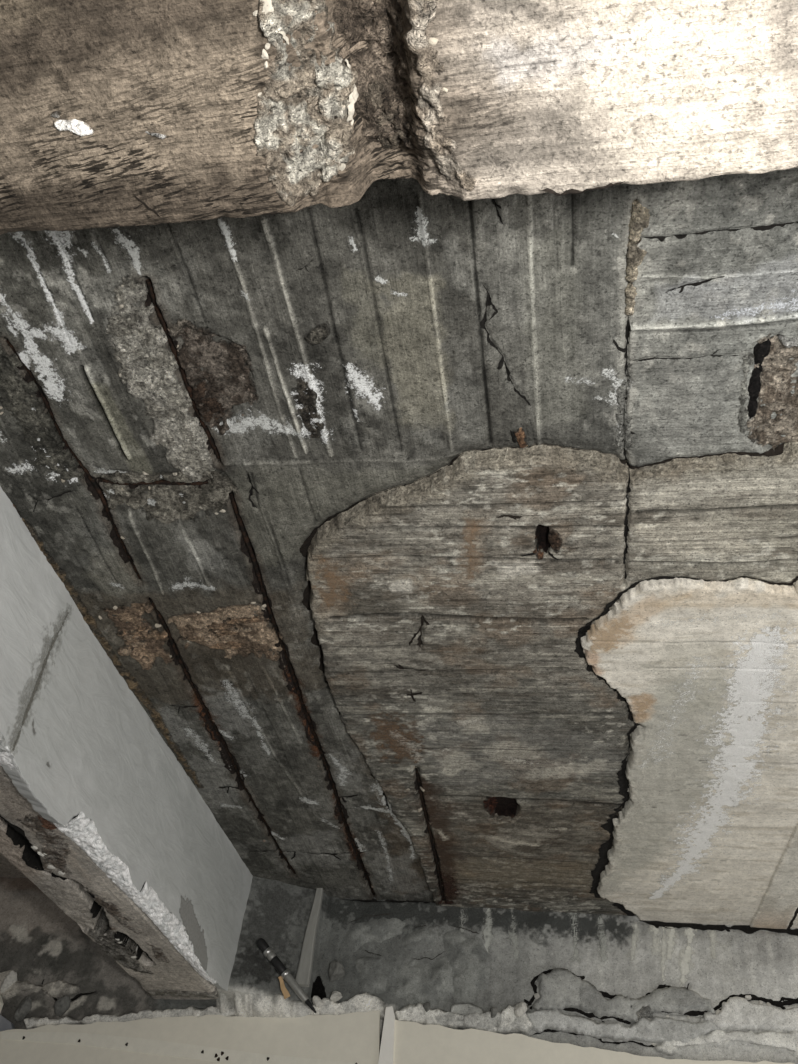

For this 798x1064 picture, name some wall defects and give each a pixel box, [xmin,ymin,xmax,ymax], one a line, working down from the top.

spalling [252,0,476,207]
efflorescence [0,231,83,406]
efflorescence [45,231,111,324]
efflorescence [215,363,333,445]
efflorescence [342,363,386,422]
spalling [737,333,798,450]
crack [248,474,259,509]
spalling [0,275,375,896]
crack [300,181,798,936]
peeling [0,731,219,998]
crack [254,848,376,860]
peeling [526,968,798,1059]